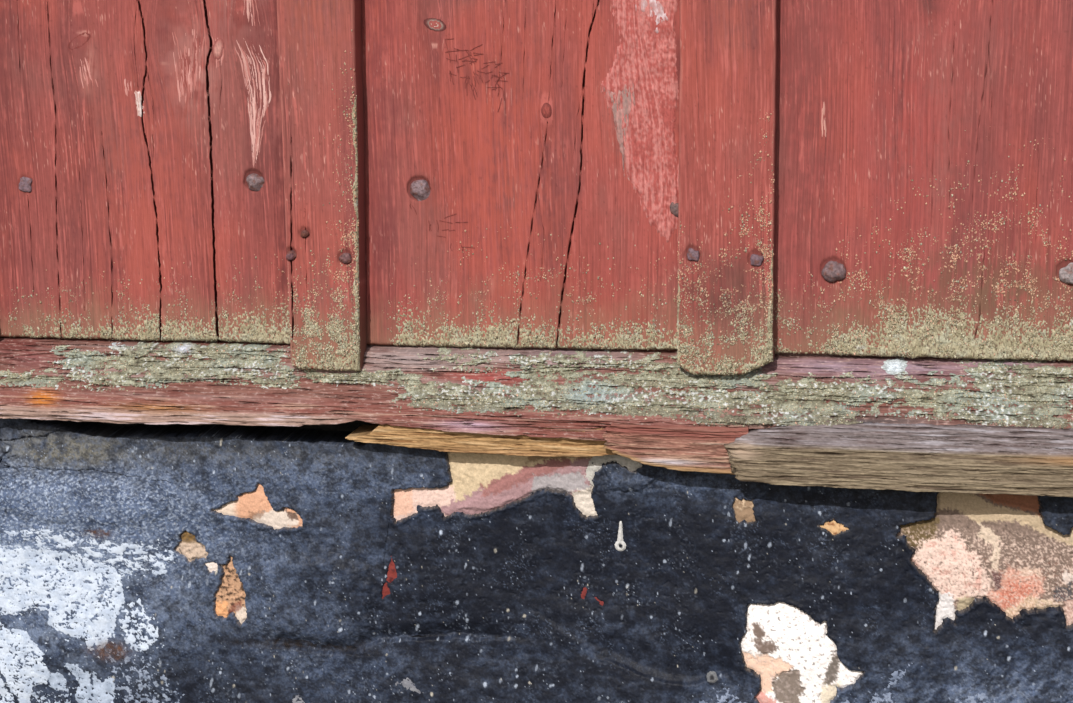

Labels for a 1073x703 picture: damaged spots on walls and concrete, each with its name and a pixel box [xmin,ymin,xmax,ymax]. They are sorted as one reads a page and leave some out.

crack [9,0,180,369]
crack [203,0,311,373]
crack [517,0,599,349]
peeling [601,0,679,242]
peeling [0,525,247,703]
flaking render [212,484,303,530]
flaking render [393,452,642,521]
flaking render [699,602,863,703]
peeling [868,663,922,703]
peeling [949,685,998,703]
flaking render [897,492,1073,629]